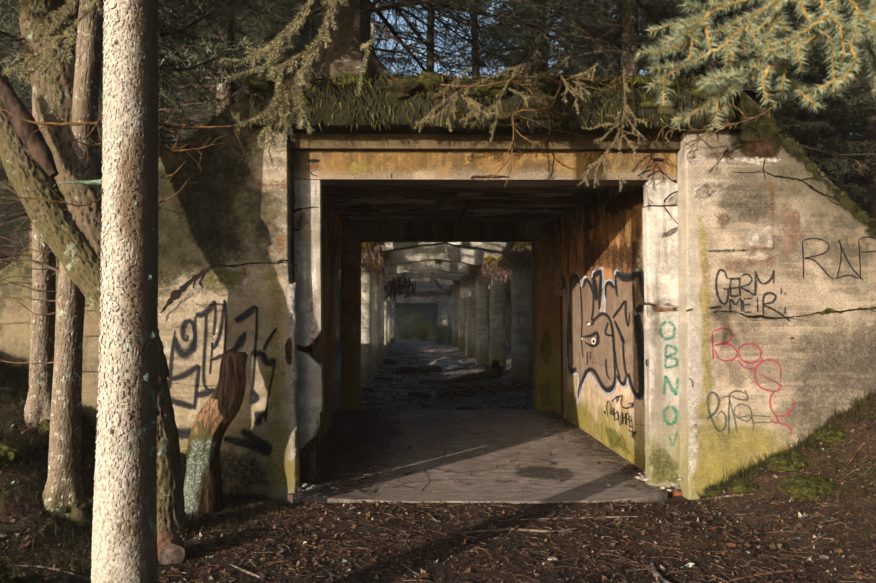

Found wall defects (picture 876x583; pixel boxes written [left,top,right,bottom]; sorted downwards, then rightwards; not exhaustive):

crack [736,159,852,205]
crack [160,260,297,314]
crack [720,307,876,321]
water stain [686,247,700,473]